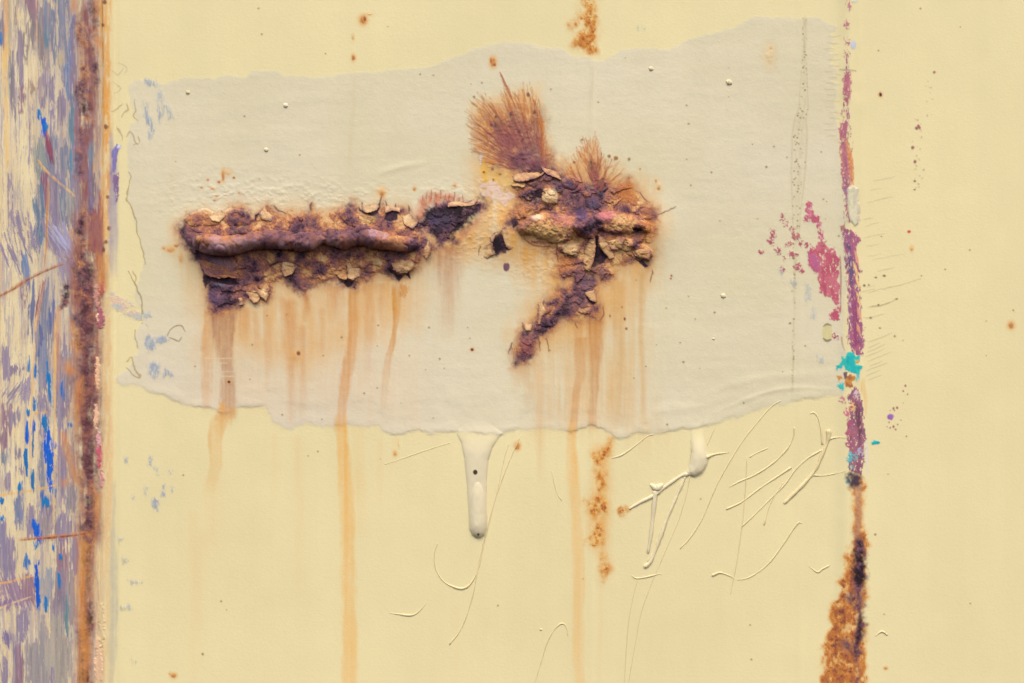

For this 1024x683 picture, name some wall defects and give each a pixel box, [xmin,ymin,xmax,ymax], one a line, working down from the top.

corrosion [563,0,605,58]
corrosion [0,0,117,683]
corrosion [159,52,683,683]
spalling [502,260,609,375]
corrosion [816,465,890,683]